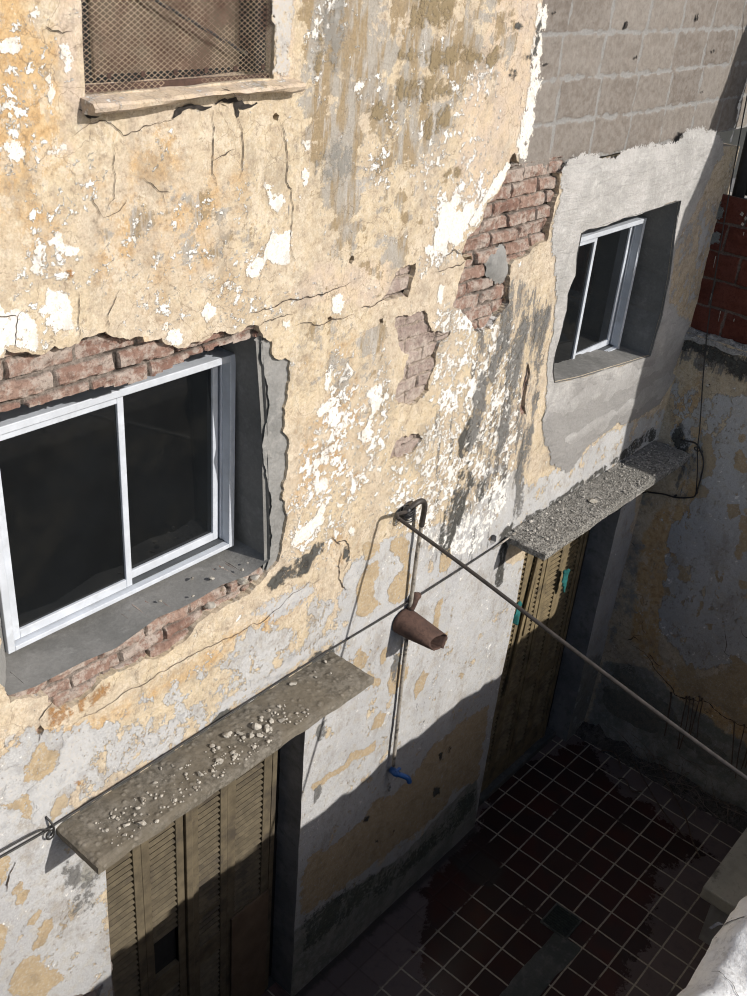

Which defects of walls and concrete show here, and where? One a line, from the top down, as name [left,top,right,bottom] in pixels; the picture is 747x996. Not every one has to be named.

crack [76,88,257,218]
crack [279,120,295,259]
spalling [425,2,563,329]
peeling [23,232,80,279]
spalling [0,287,259,412]
crack [253,283,388,326]
spalling [394,311,449,404]
leakage [682,341,747,381]
leakage [439,306,550,555]
spalling [7,561,263,707]
peeling [0,719,96,824]
crack [709,916,745,929]